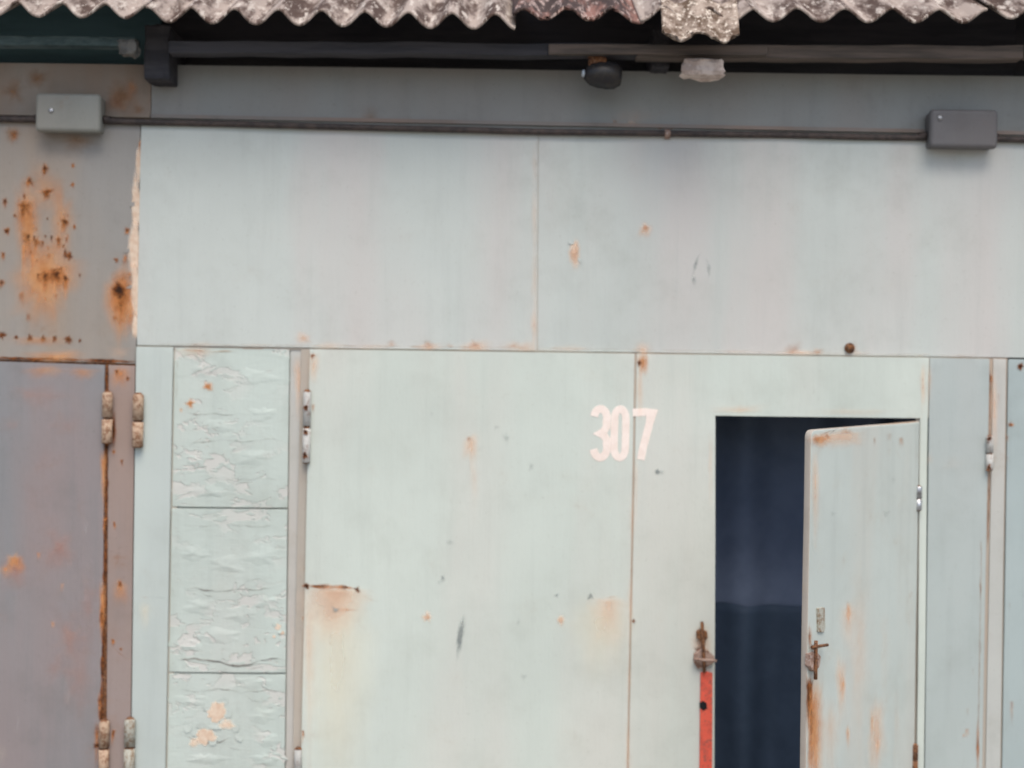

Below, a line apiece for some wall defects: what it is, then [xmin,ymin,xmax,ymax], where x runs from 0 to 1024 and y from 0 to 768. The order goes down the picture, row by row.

rust [3,178,80,299]
peeling [124,142,141,336]
rust [0,333,81,343]
rust [111,273,132,323]
rust [94,418,123,747]
rust [303,583,359,613]
peeling [184,698,243,746]
rust [807,681,818,764]